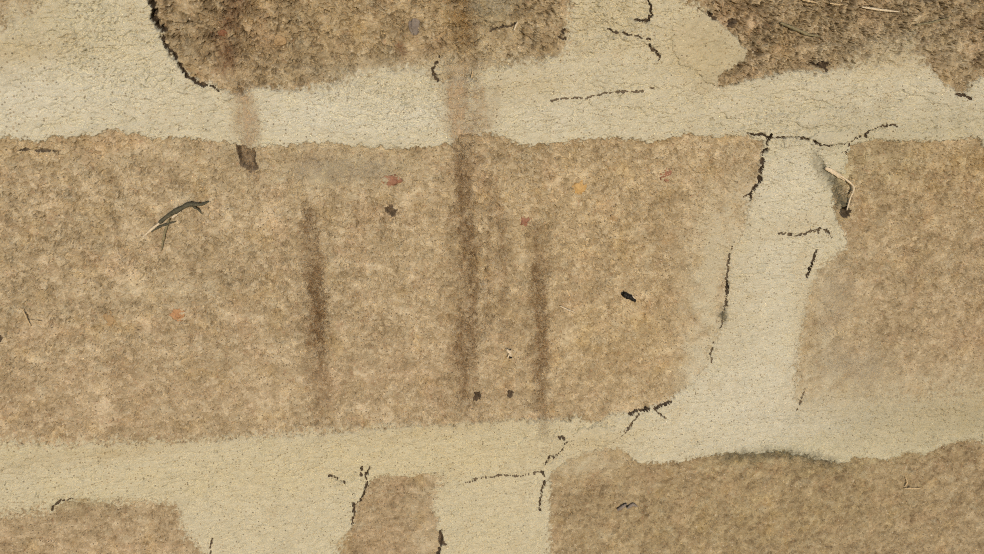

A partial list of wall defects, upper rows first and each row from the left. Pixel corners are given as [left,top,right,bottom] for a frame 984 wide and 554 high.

peeling [671,11,747,95]
hole [236,144,259,173]
crack [743,124,898,202]
crack [778,227,832,278]
crack [709,246,733,363]
crack [613,401,672,443]
crack [328,466,370,525]
crack [465,435,574,511]